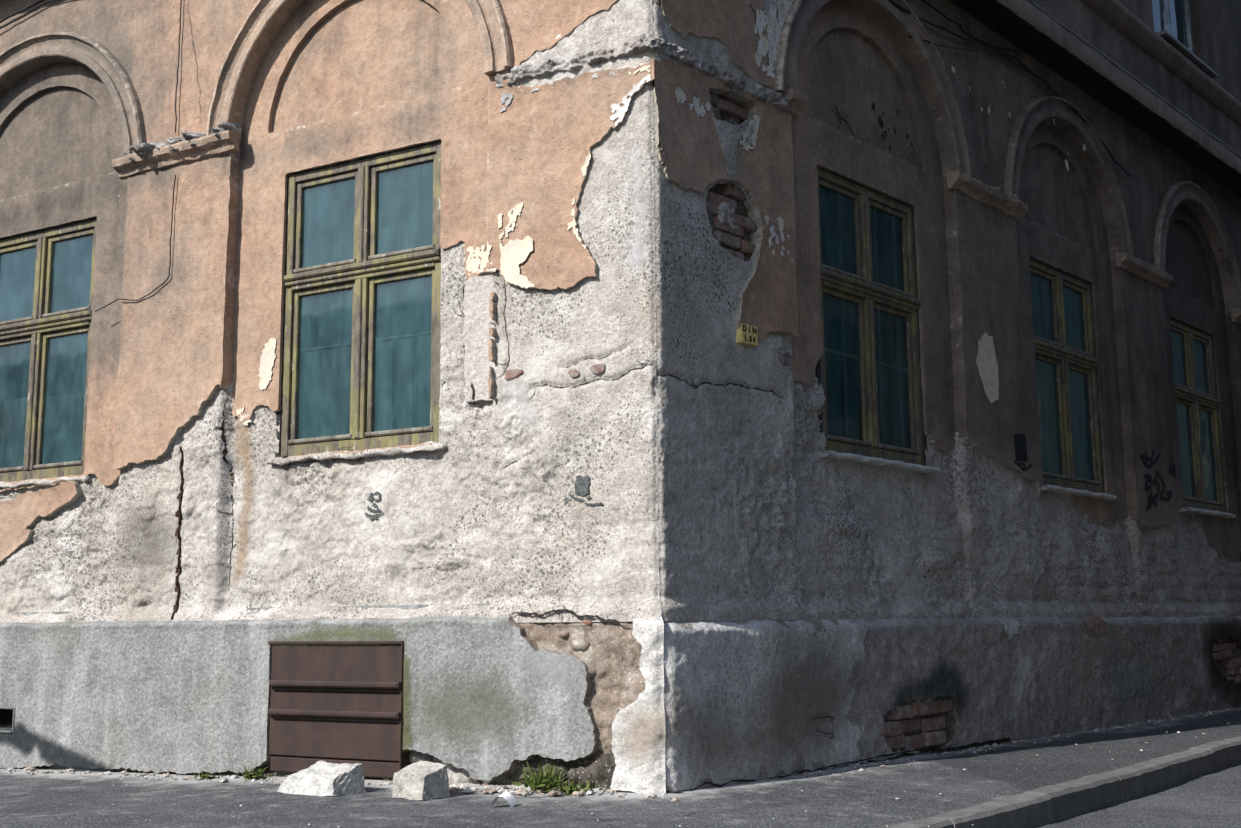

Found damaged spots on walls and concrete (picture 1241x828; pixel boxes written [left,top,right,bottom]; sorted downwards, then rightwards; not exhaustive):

flaking render [517,0,767,93]
peeling [754,0,793,78]
flaking render [206,74,1241,754]
flaking render [0,383,234,624]
spalling [0,709,13,728]
flaking render [517,754,597,788]